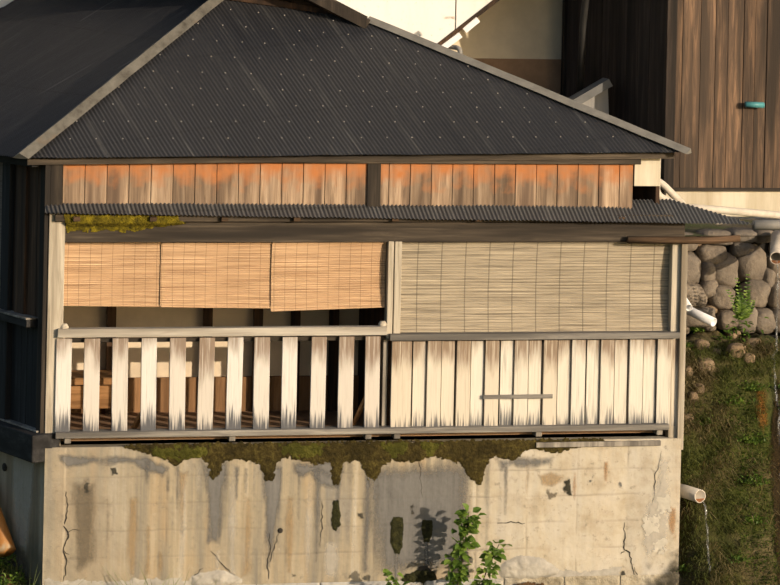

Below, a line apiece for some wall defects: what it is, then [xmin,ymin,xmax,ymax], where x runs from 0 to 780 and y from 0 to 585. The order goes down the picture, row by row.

crack [63,492,80,580]
water stain [76,486,93,566]
water stain [60,455,167,476]
water stain [204,464,226,542]
water stain [263,468,282,549]
crack [267,533,279,579]
water stain [295,462,341,525]
water stain [364,464,468,570]
crack [621,523,638,575]
crack [648,461,663,517]